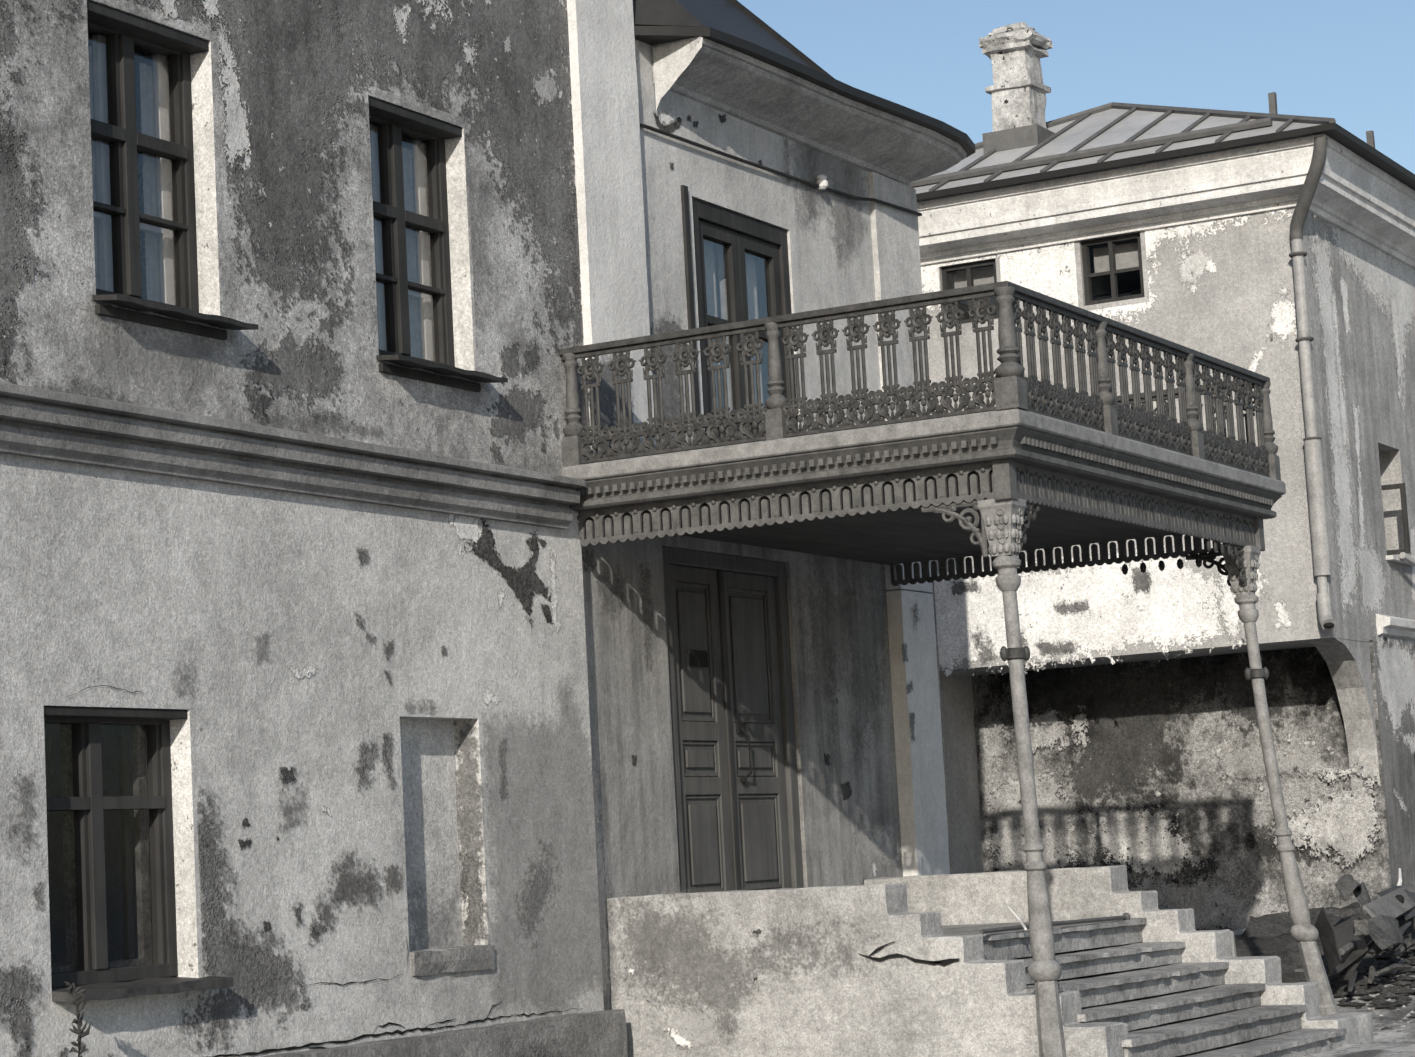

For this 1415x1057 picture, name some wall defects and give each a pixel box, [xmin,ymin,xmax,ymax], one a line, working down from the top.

peeling [201,0,251,170]
peeling [392,0,491,83]
peeling [921,207,1310,326]
peeling [1247,287,1298,372]
damp [1309,222,1415,619]
spalling [448,514,561,632]
peeling [934,543,1246,680]
peeling [1255,560,1292,630]
peeling [1373,629,1415,754]
spalling [238,818,251,850]
crack [858,941,960,966]
crack [206,1001,582,1057]